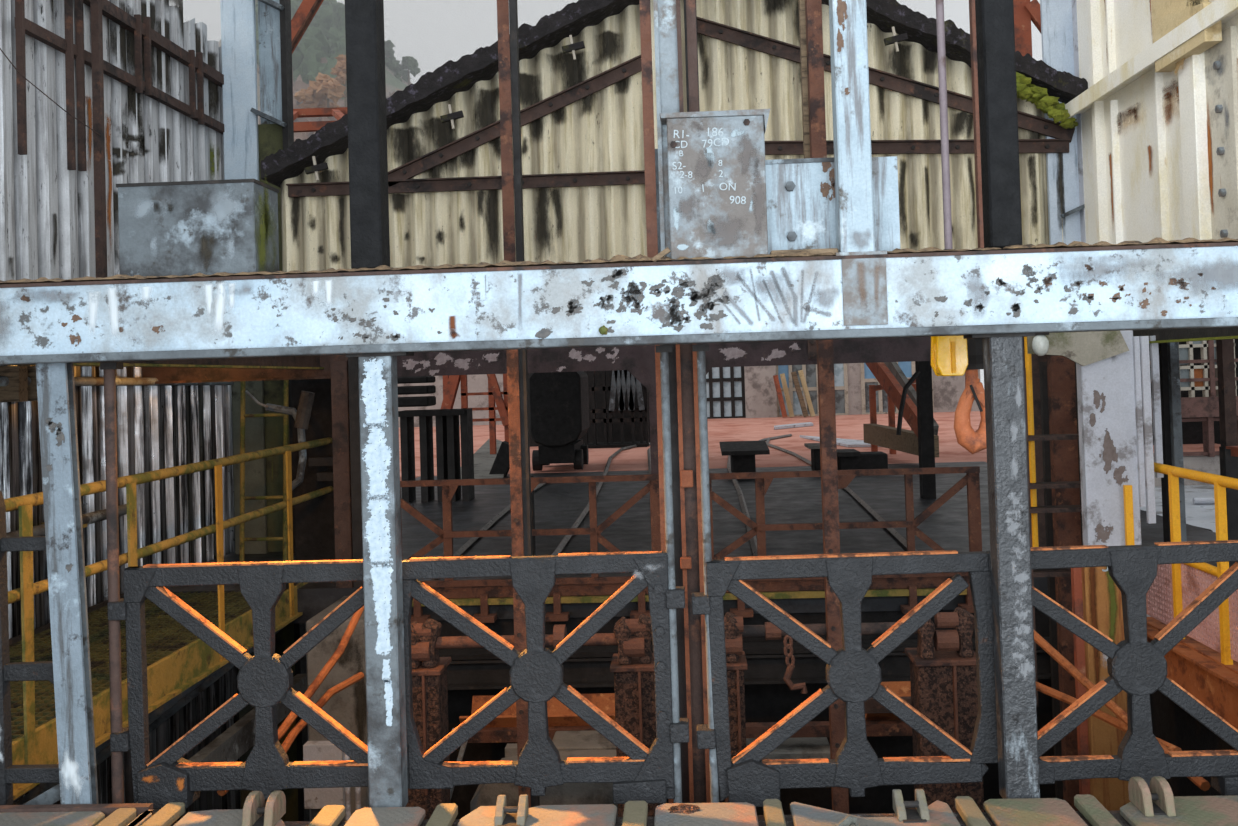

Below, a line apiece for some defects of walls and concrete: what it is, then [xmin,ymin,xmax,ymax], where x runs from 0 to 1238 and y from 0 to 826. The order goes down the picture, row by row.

rust [837,0,848,54]
damp [551,31,620,90]
rust [1163,82,1179,123]
damp [391,117,457,165]
damp [477,190,499,255]
damp [536,188,562,252]
rust [854,233,870,247]
damp [899,160,907,231]
peeling [542,269,734,372]
peeling [963,264,1203,318]
peeling [1089,390,1129,485]
peeling [360,358,394,726]